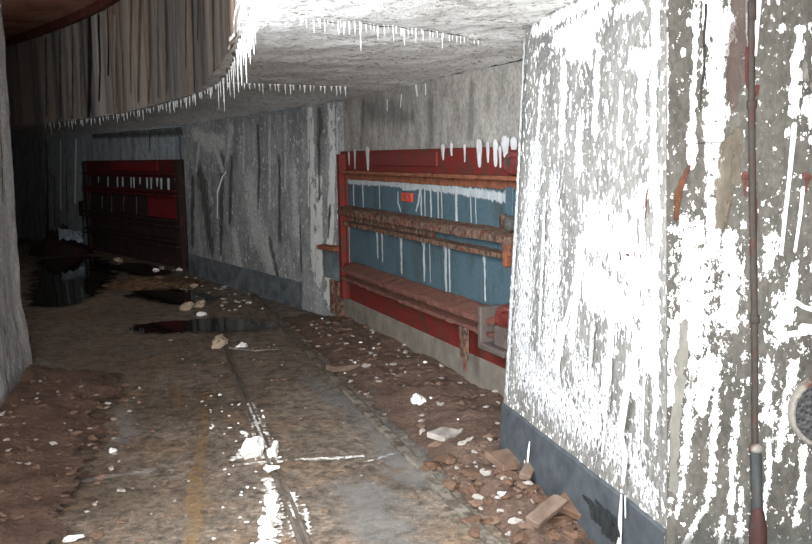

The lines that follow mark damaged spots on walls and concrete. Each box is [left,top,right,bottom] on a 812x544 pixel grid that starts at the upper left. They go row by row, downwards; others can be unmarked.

peeling [531,0,679,191]
rust [724,0,760,110]
spalling [802,59,812,94]
leakage [92,102,338,306]
rust [674,164,691,221]
peeling [667,201,749,495]
peeling [757,229,812,447]
spalling [582,495,620,542]